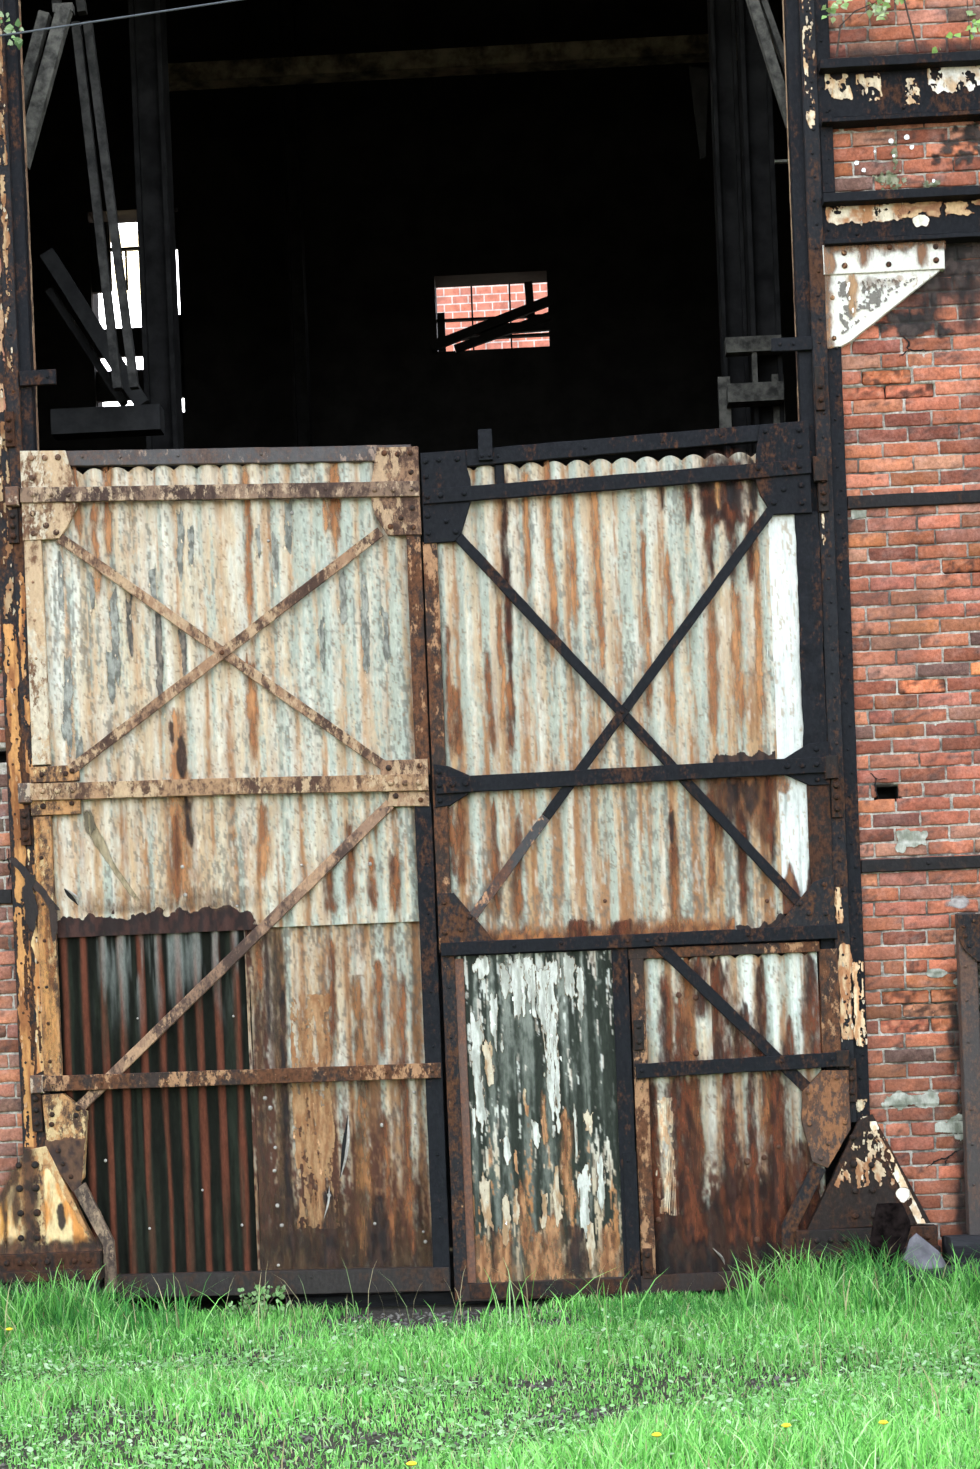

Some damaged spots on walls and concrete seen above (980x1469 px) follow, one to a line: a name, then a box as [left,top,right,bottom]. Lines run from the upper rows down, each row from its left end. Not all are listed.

peeling [904,66,980,105]
peeling [825,199,980,227]
peeling [0,17,44,1149]
rust [73,467,112,594]
rust [242,470,253,625]
rust [246,653,258,757]
rust [484,453,812,940]
rust [0,709,433,1270]
peeling [838,942,957,1047]
peeling [468,952,606,1270]
rust [649,953,822,1275]
peeling [834,1099,926,1224]